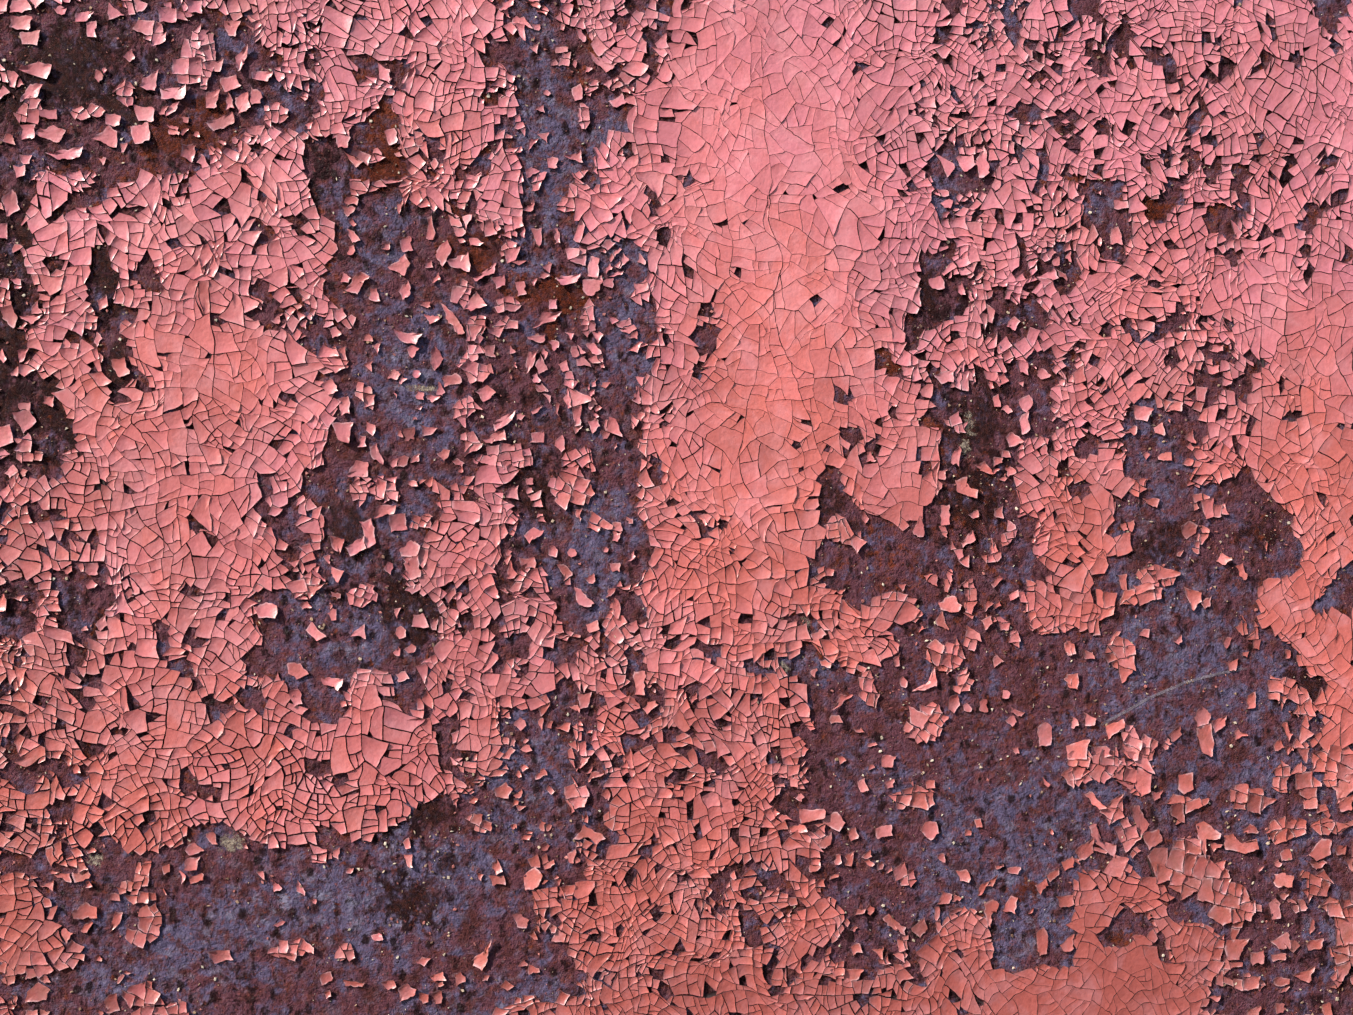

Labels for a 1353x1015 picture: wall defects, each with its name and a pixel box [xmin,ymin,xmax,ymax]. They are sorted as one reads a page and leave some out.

corrosion [0,21,229,164]
crack [454,3,474,89]
corrosion [0,212,87,468]
crack [712,57,815,491]
crack [1257,295,1353,457]
crack [93,457,265,560]
peeling [0,0,674,1015]
corrosion [509,454,580,529]
peeling [676,501,718,551]
corrosion [949,471,1000,555]
peeling [685,0,1353,1015]
corrosion [376,579,462,673]